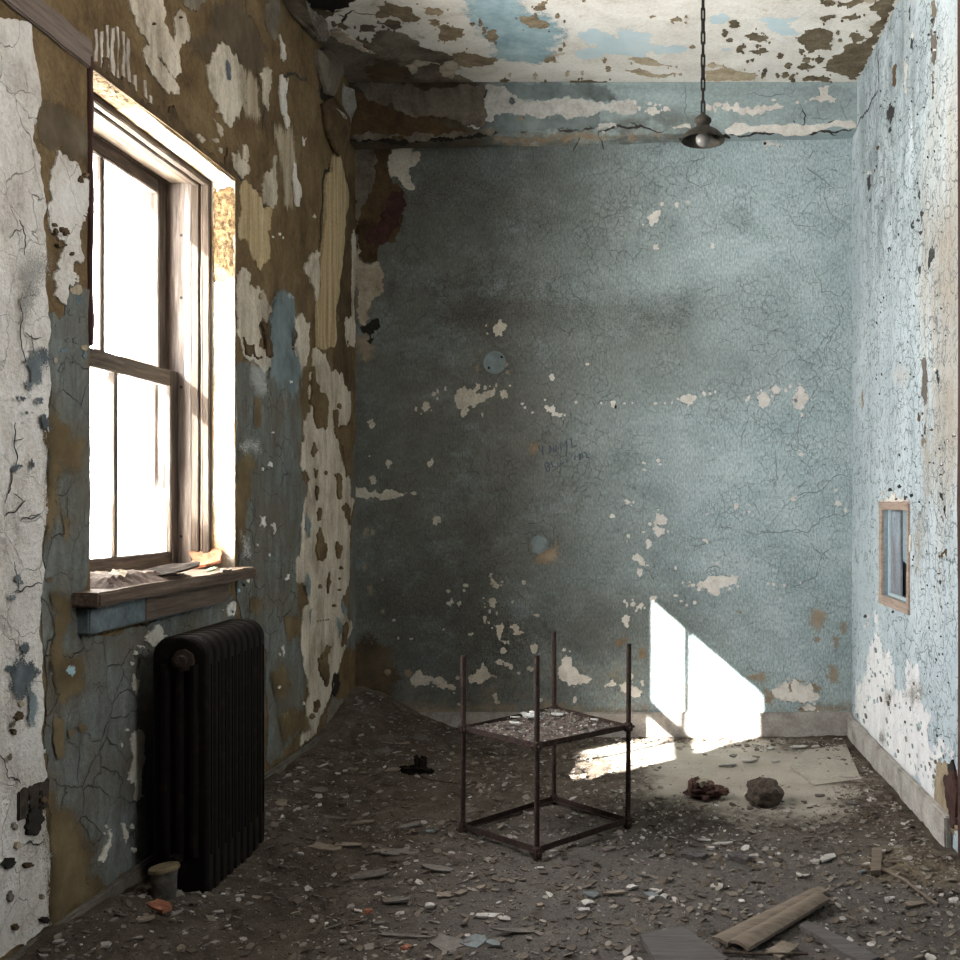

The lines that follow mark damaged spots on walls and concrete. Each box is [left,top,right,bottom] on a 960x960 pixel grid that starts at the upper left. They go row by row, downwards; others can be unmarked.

peeling [705,0,895,104]
flaking render [706,98,856,150]
crack [350,115,711,260]
crack [10,220,26,255]
crack [20,292,42,381]
crack [689,13,951,743]
crack [5,422,41,521]
flaking render [0,0,671,958]
crack [13,562,43,593]
peeling [673,562,739,607]
peeling [772,677,820,712]
peeling [854,593,958,835]